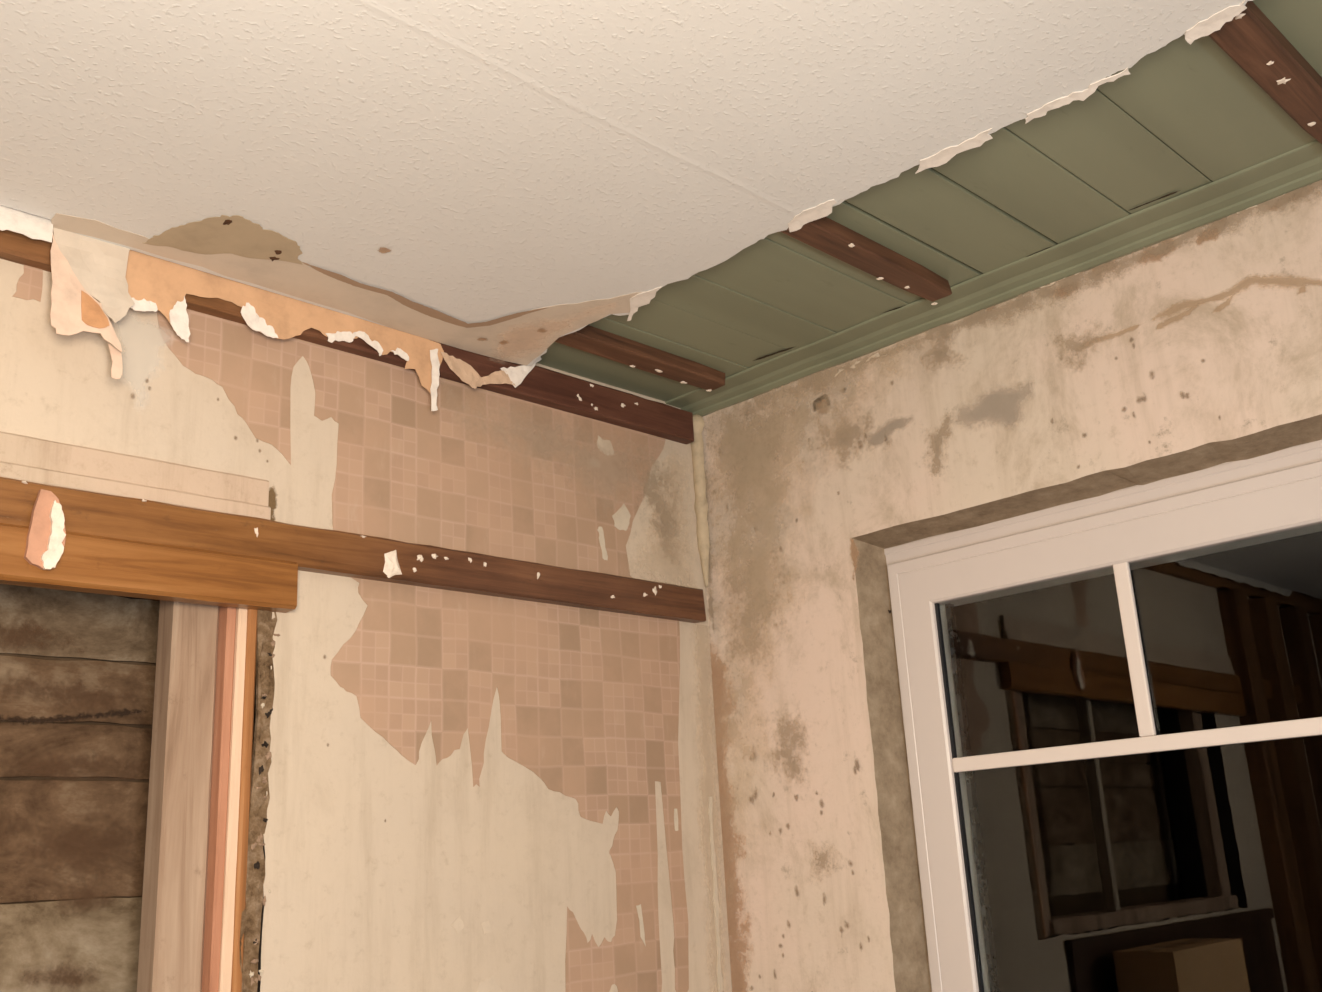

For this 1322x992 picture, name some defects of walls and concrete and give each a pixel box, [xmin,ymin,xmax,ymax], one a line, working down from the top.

flaking render [1196,187,1311,244]
peeling [50,227,541,411]
crack [1080,275,1322,348]
water stain [713,180,1322,661]
flaking render [240,610,280,992]
water stain [772,720,804,777]